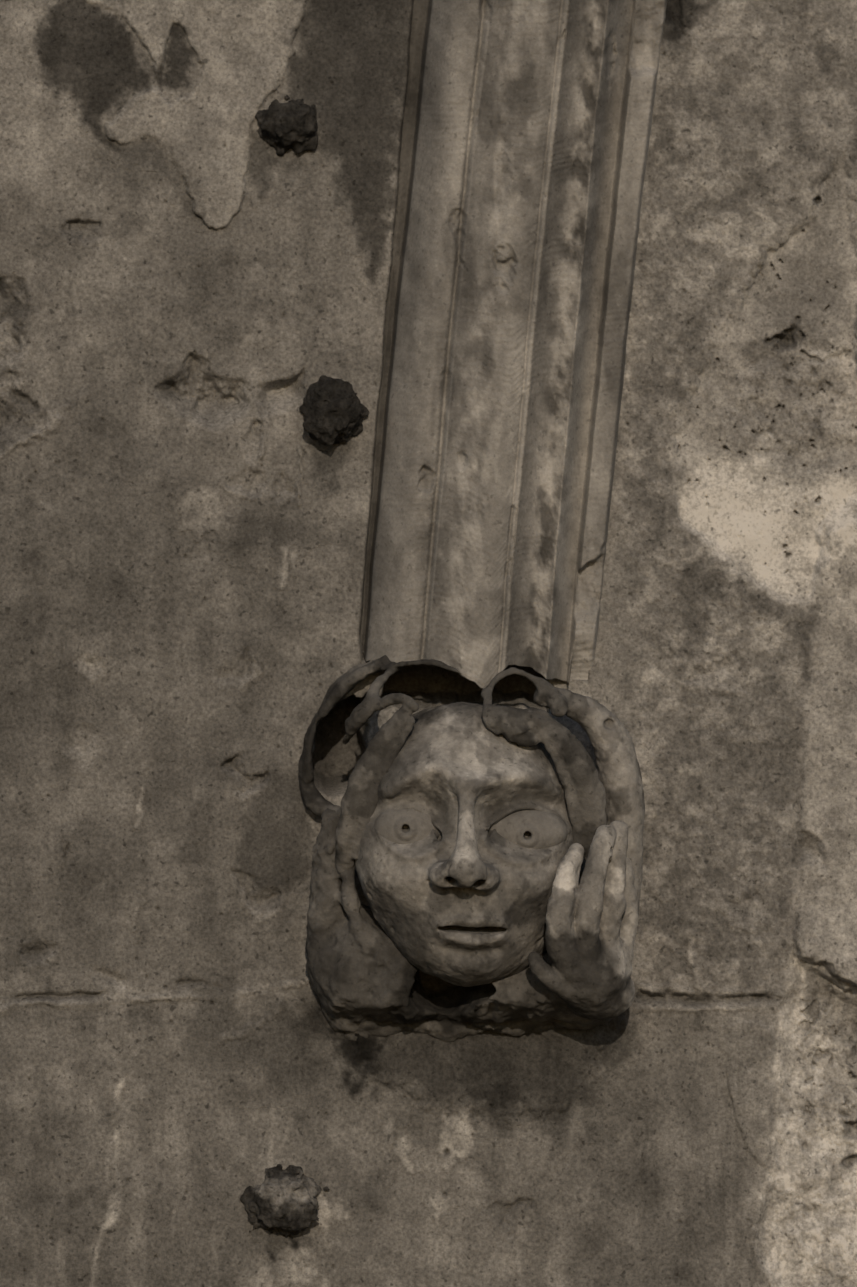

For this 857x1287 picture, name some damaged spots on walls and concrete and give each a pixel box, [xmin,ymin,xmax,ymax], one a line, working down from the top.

peeling [89,0,296,232]
spalling [0,267,91,470]
peeling [150,350,309,501]
spalling [651,141,857,1287]
crack [0,975,309,1047]